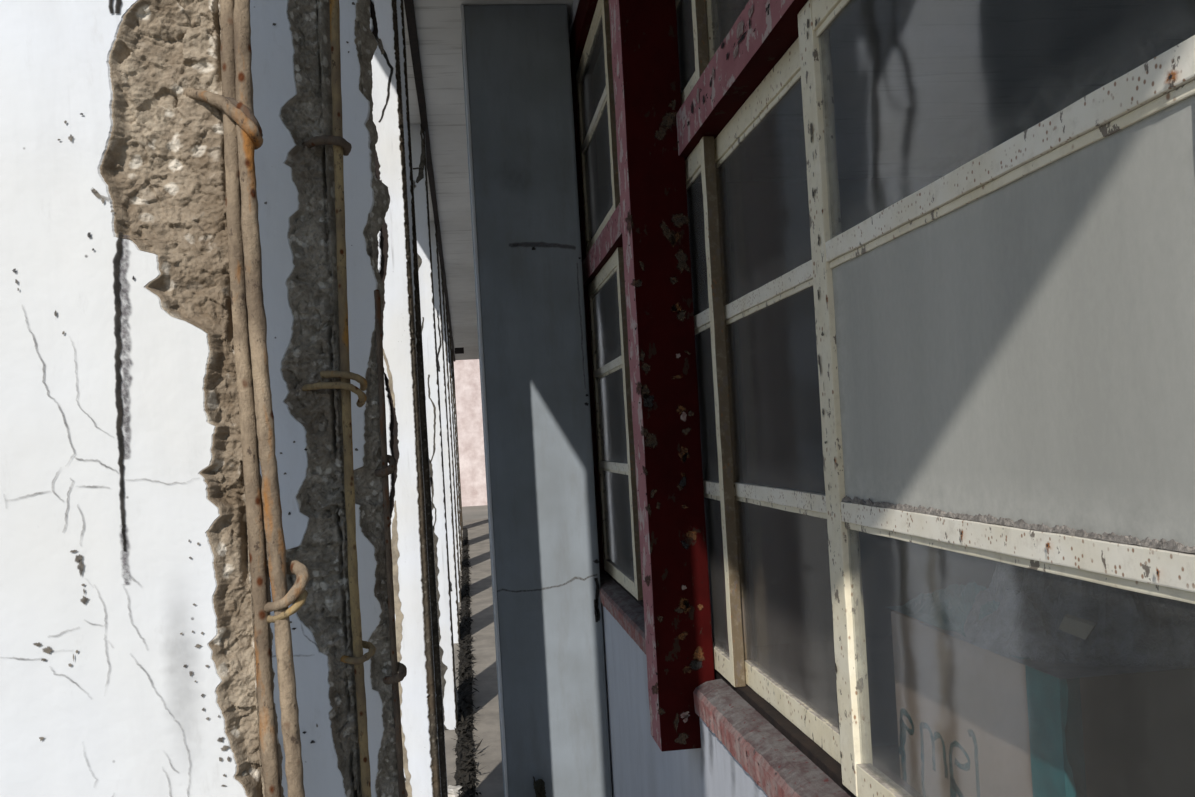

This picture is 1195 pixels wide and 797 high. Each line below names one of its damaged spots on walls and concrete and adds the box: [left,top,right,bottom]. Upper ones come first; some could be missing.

crack [109,0,122,14]
crack [370,0,393,182]
crack [379,218,389,337]
crack [33,232,126,604]
spalling [91,0,463,797]
crack [384,372,399,525]
peeling [636,352,654,408]
peeling [676,405,694,509]
crack [493,574,597,593]
crack [18,642,78,683]
peeling [652,682,690,745]